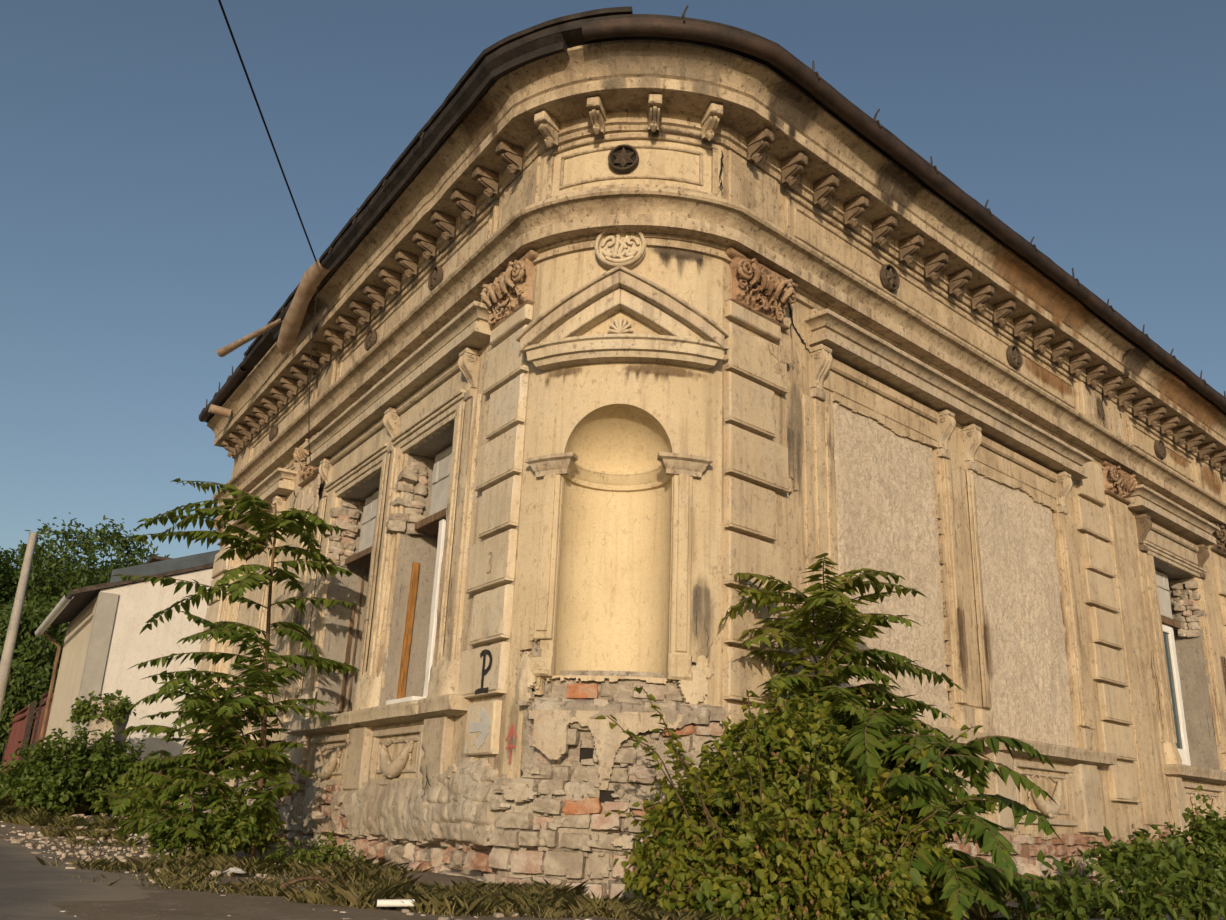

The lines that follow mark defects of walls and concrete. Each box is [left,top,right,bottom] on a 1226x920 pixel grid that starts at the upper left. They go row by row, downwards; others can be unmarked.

leakage [769,79,819,136]
crack [717,150,725,195]
leakage [877,161,921,214]
flaking render [484,629,726,903]
flaking render [939,824,1174,892]